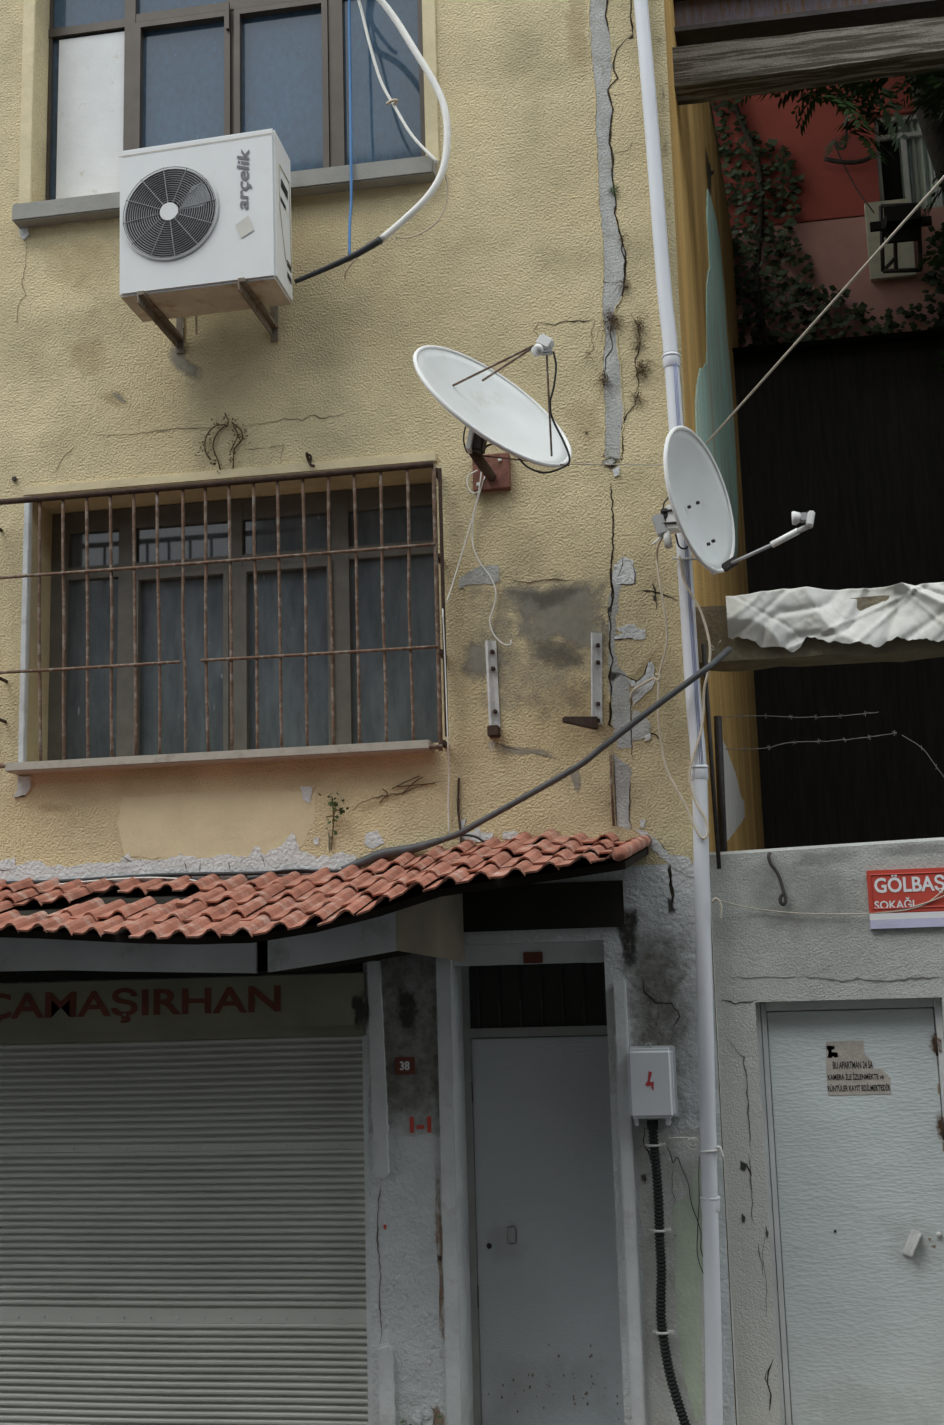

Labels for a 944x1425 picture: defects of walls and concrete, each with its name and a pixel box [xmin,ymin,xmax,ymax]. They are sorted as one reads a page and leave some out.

crack [533,0,677,620]
water stain [463,620,504,676]
water stain [512,578,605,663]
peeling [607,579,694,898]
peeling [0,831,384,883]